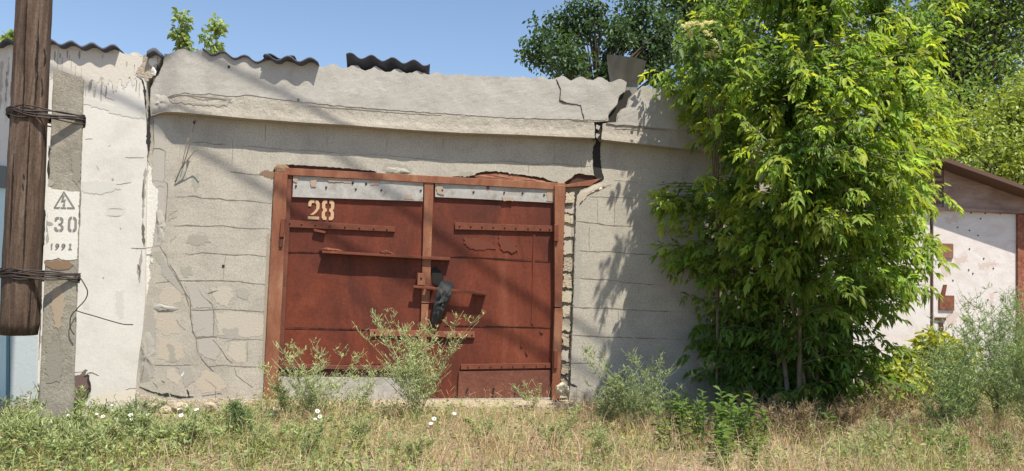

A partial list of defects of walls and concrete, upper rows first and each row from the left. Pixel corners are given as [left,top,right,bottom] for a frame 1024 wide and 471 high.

peeling [145,163,184,385]
crack [97,65,272,398]
spalling [135,370,257,414]
peeling [211,286,264,363]
crack [194,79,684,387]